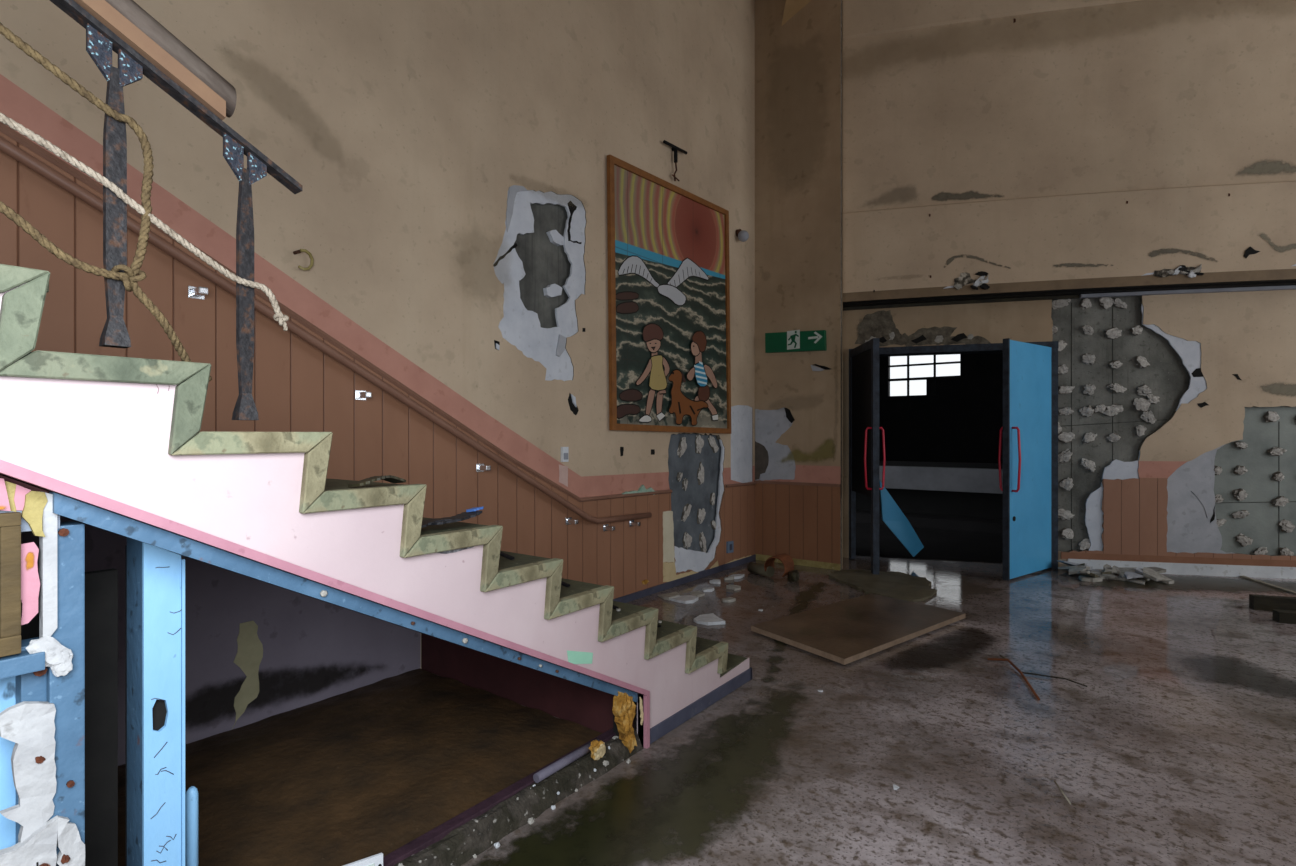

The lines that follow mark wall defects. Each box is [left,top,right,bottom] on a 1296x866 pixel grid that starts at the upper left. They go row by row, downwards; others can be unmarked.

spalling [493,185,586,415]
spalling [855,310,990,346]
spalling [943,271,990,290]
spalling [1142,264,1204,278]
spalling [622,405,796,585]
spalling [1051,296,1208,551]
spalling [1167,406,1296,556]
peeling [26,635,73,677]
water stain [1188,657,1296,698]
peeling [0,701,85,866]